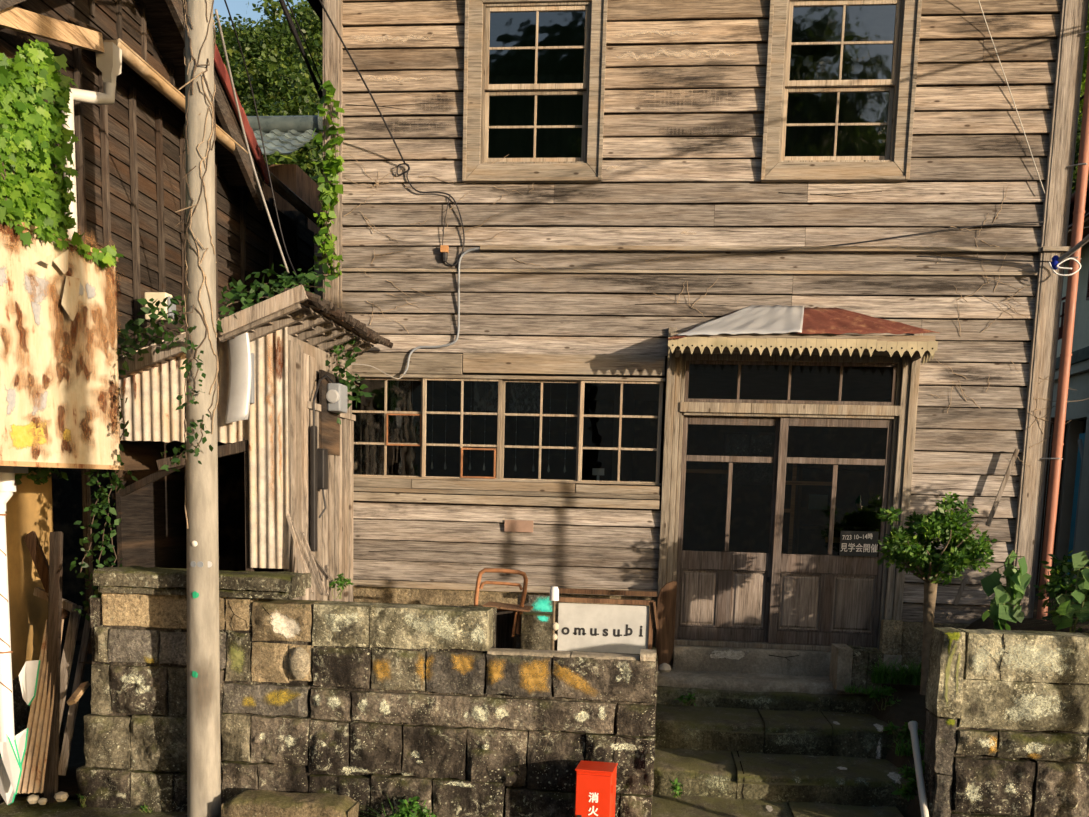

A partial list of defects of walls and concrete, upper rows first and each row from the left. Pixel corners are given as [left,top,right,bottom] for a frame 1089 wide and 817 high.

corrosion [0,222,33,251]
corrosion [1,233,136,460]
crack [981,634,1035,680]